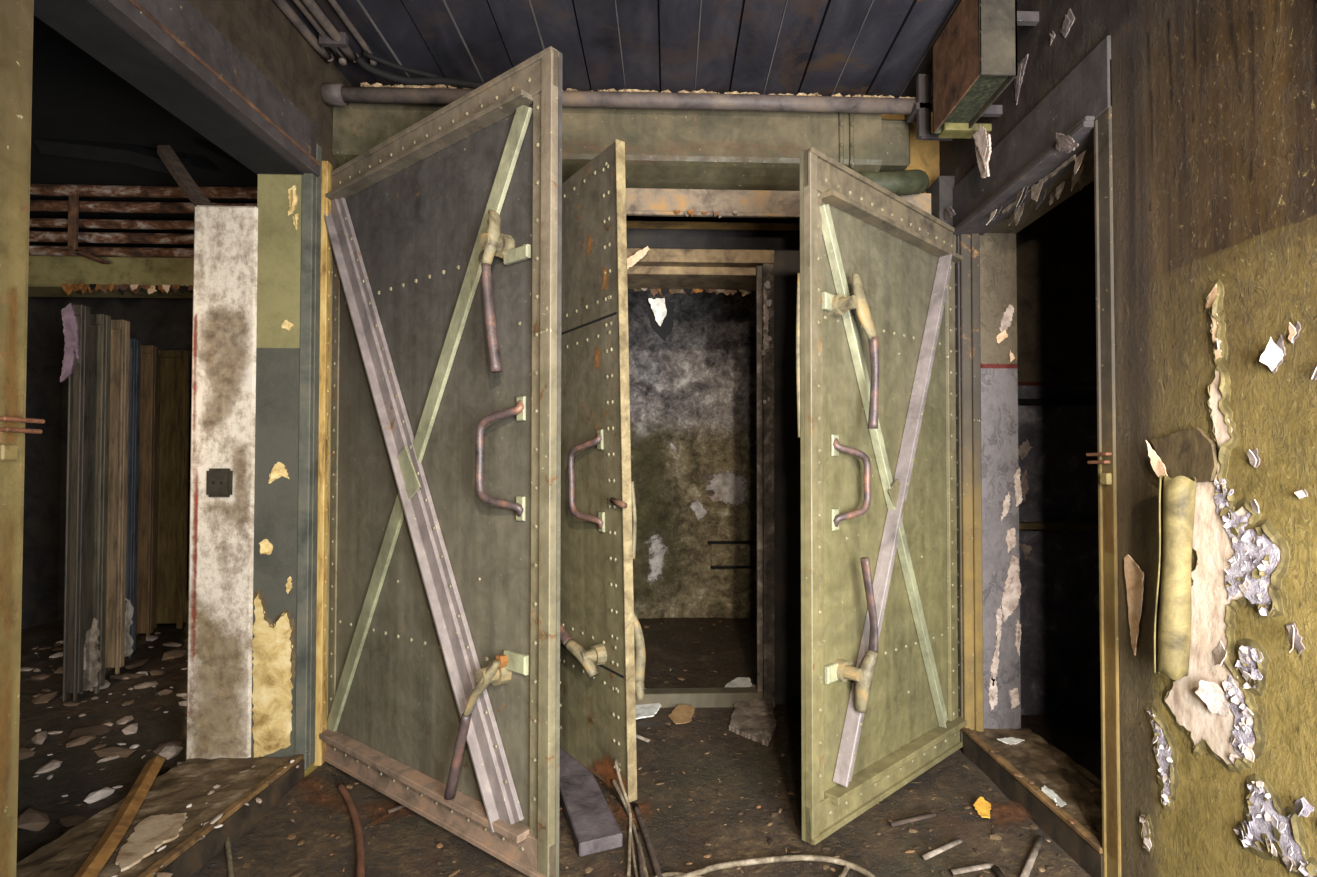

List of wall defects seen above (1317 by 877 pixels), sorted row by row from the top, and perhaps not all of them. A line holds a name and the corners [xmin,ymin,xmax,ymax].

leakage [204,310,246,427]
leakage [209,449,246,523]
leakage [630,433,680,604]
peeling [988,439,1033,710]
peeling [1124,279,1317,877]
peeling [251,589,296,757]